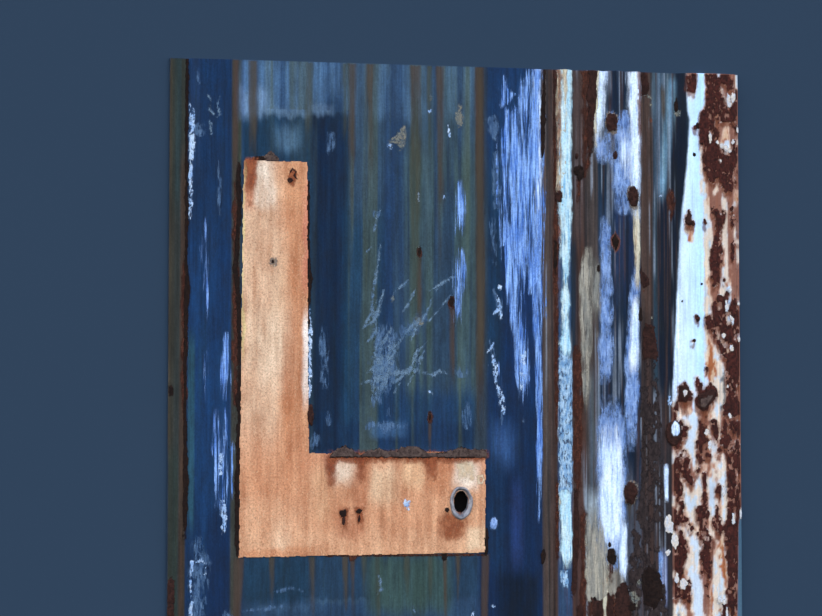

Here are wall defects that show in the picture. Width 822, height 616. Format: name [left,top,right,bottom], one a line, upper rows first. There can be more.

corrosion [574,70,598,202]
corrosion [605,111,619,137]
corrosion [686,73,738,197]
corrosion [326,445,488,485]
peeling [488,343,505,414]
peeling [493,69,547,496]
corrosion [540,69,563,444]
peeling [556,69,614,588]
peeling [585,71,641,616]
corrosion [571,206,741,616]
spalling [665,385,717,450]
peeling [674,573,688,590]